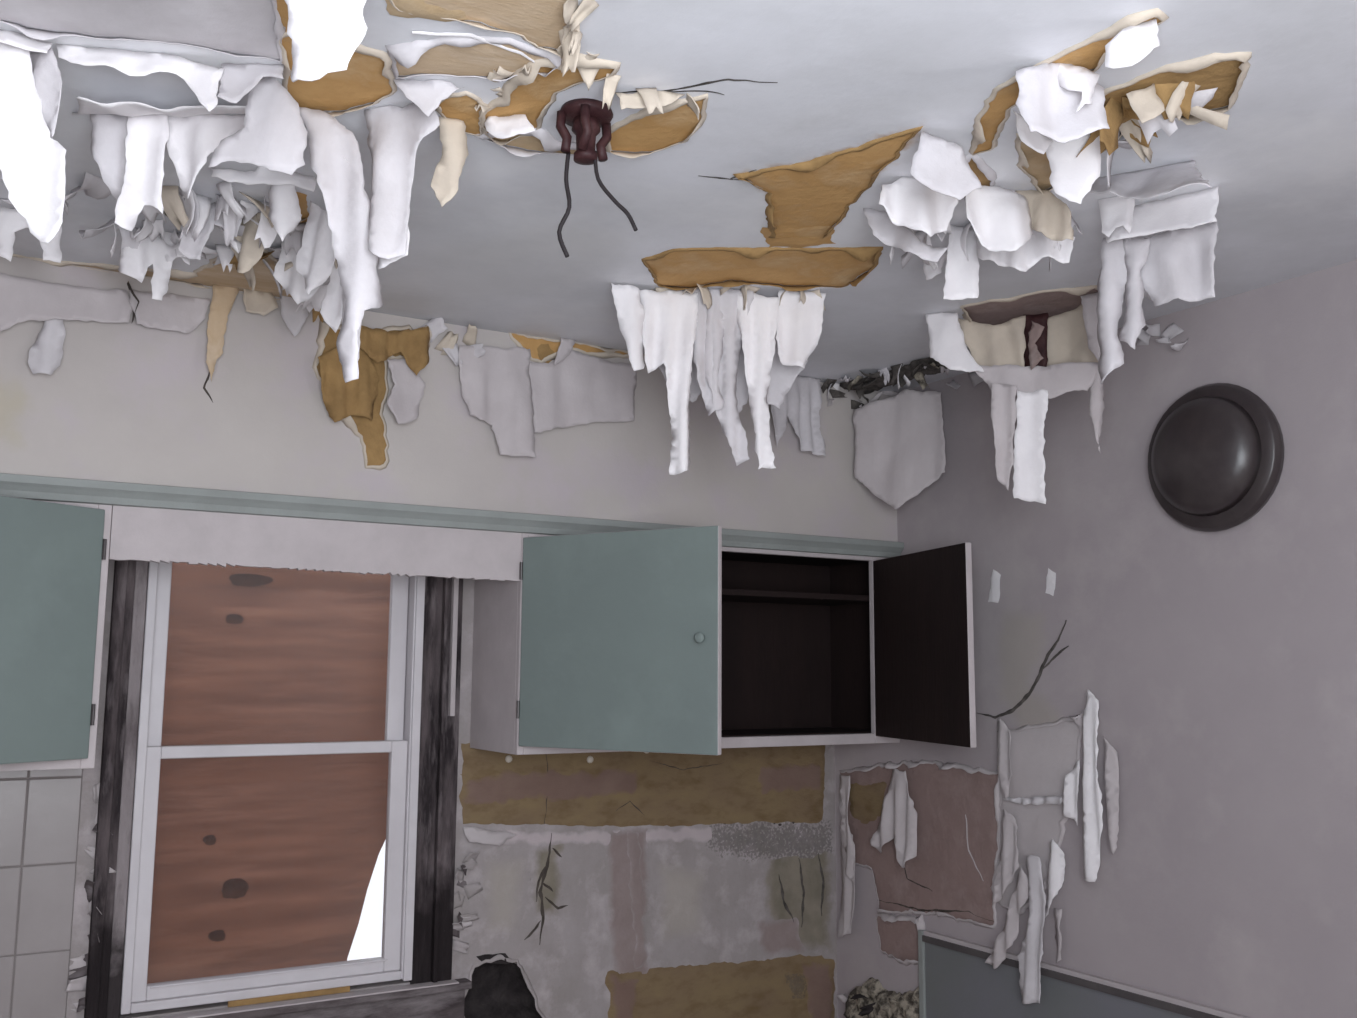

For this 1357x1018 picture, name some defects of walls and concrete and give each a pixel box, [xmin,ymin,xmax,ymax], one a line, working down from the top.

peeling [0,0,1252,510]
crack [978,620,1069,719]
peeling [838,769,917,937]
peeling [985,689,1119,1004]